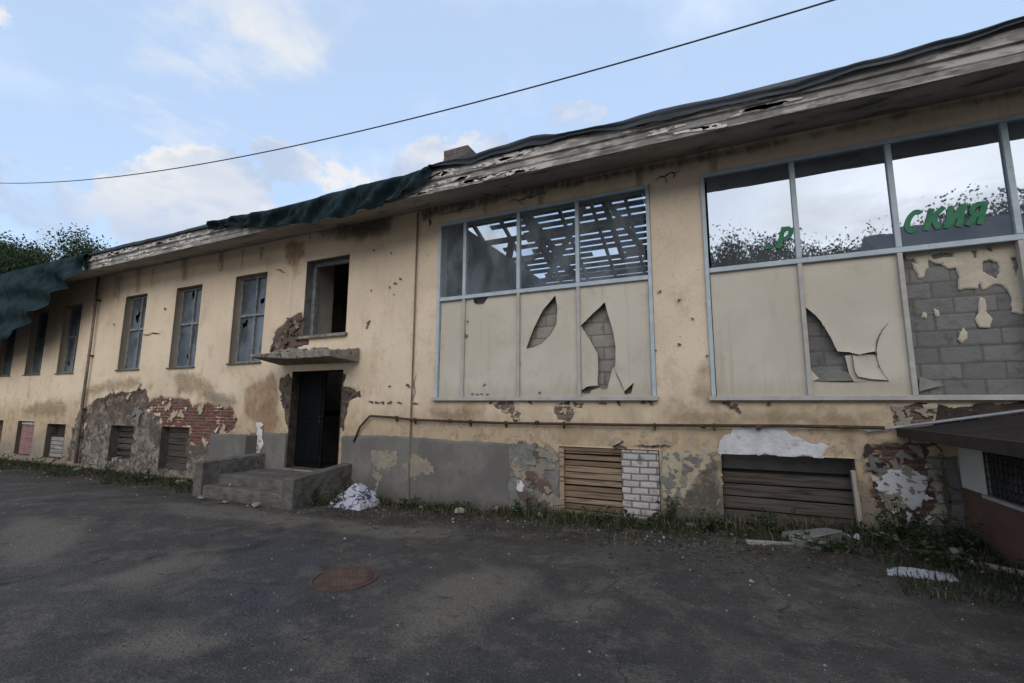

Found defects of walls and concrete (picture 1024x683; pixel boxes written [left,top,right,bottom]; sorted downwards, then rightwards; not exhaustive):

peeling [617,93,805,138]
peeling [408,147,541,198]
peeling [85,232,200,267]
peeling [269,317,305,352]
spalling [554,303,612,422]
spalling [67,389,237,478]
spalling [510,442,564,508]
flaking render [863,402,938,530]